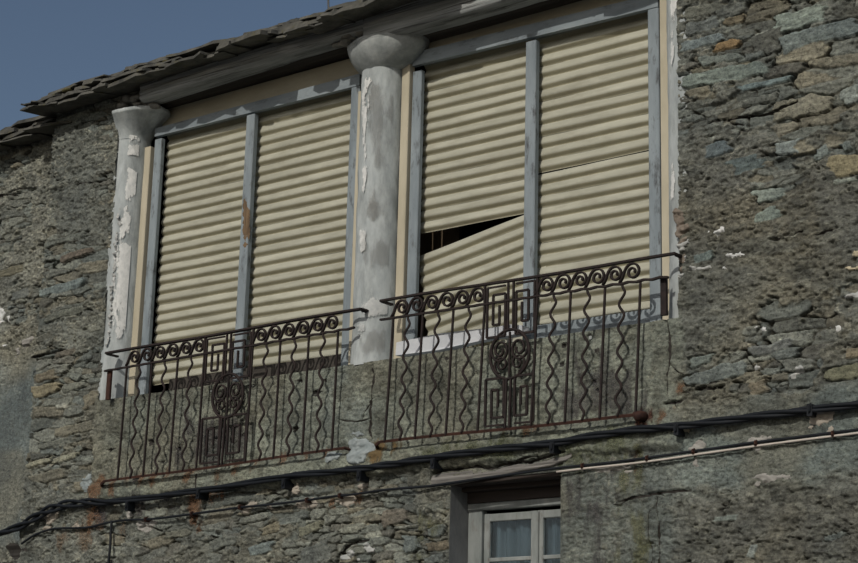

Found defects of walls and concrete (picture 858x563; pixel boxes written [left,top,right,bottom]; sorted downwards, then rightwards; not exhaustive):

peeling [670,0,678,64]
peeling [127,135,140,156]
peeling [361,77,372,193]
peeling [105,167,137,347]
crack [665,322,724,408]
crack [340,368,375,437]
spalling [325,431,376,465]
crack [613,489,690,563]